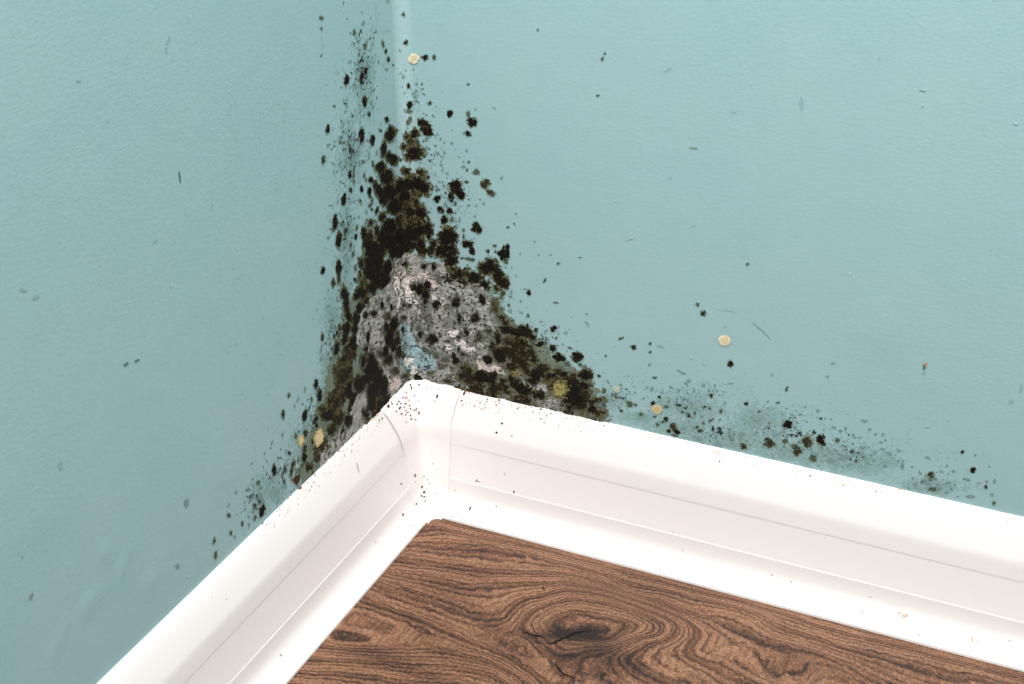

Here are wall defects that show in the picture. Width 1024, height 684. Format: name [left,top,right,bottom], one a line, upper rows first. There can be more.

peeling [356,253,564,413]
water stain [227,1,996,538]